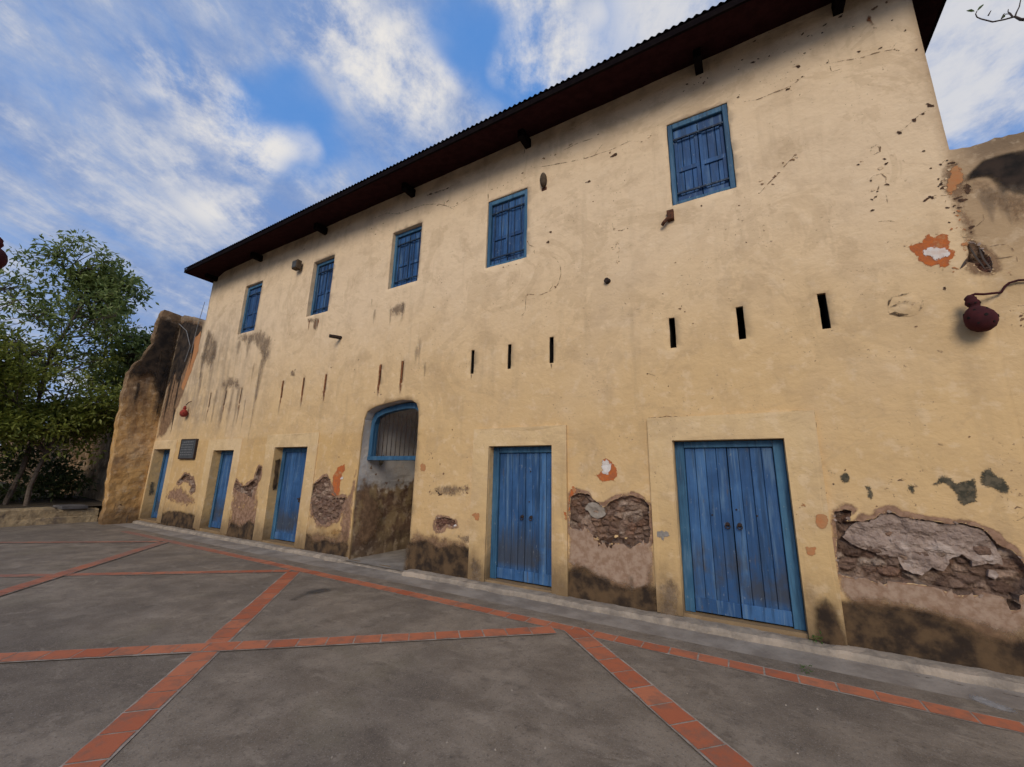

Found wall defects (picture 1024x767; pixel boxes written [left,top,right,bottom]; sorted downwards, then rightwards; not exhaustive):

peeling [904,166,995,275]
water stain [242,333,270,361]
flaking render [166,472,196,506]
flaking render [231,465,262,525]
flaking render [310,455,406,547]
flaking render [433,515,458,533]
peeling [595,458,618,482]
flaking render [564,486,669,588]
water stain [934,468,1009,505]
water stain [568,563,677,615]
flaking render [815,504,1024,632]
water stain [816,597,1024,677]